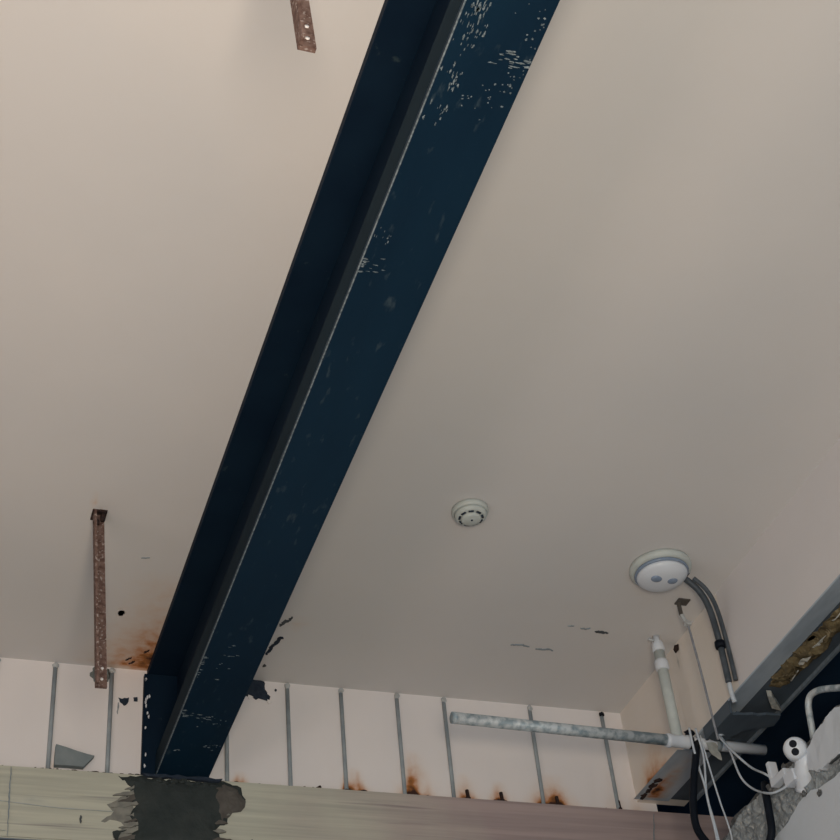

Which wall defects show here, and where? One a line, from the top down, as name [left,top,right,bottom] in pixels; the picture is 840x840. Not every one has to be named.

rust [56,561,95,666]
rust [105,563,182,671]
peeling [262,617,293,667]
peeling [245,680,277,704]
peeling [766,690,781,711]
rust [332,743,712,812]
spalling [725,761,840,840]